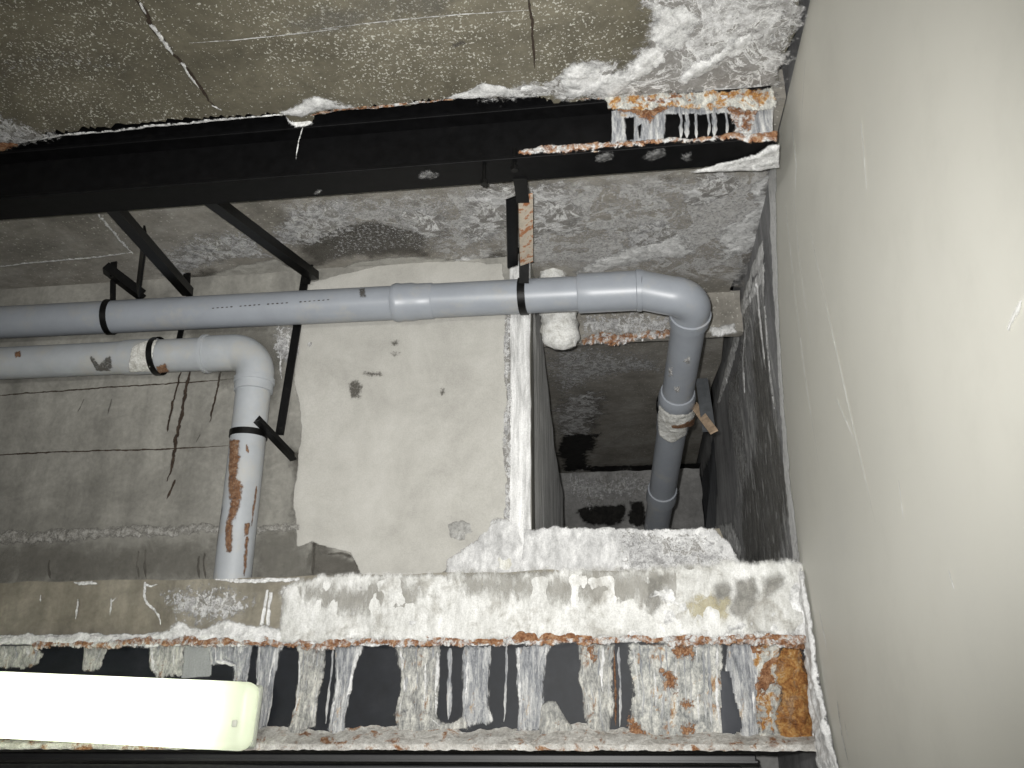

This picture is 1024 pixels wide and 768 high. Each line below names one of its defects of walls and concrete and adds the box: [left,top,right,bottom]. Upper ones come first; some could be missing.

crack [135,0,222,111]
corrosion [617,106,667,123]
corrosion [582,328,670,346]
leakage [0,145,849,768]
corrosion [216,439,257,575]
corrosion [667,645,695,661]
peeling [720,671,742,735]
peeling [750,644,805,736]